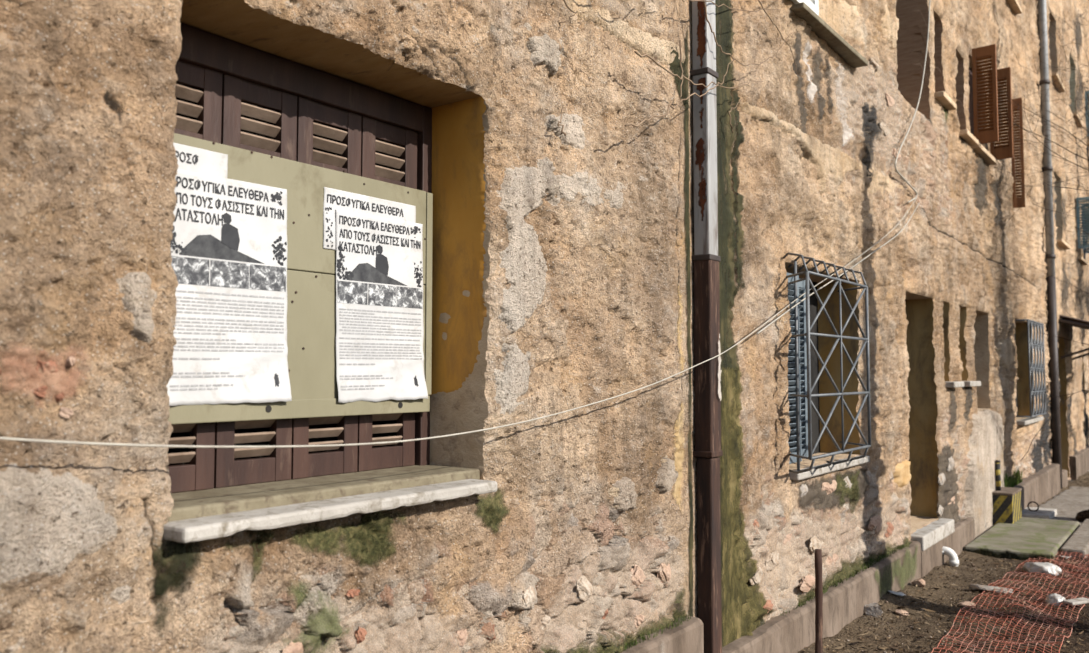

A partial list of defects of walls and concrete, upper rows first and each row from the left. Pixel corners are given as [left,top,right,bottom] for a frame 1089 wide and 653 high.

flaking render [524,23,565,75]
corrosion [695,1,707,221]
peeling [430,97,623,414]
damp [715,0,773,647]
flaking render [0,463,118,590]
damp [247,530,271,575]
damp [356,510,398,566]
spalling [282,642,304,653]
spalling [339,626,367,653]